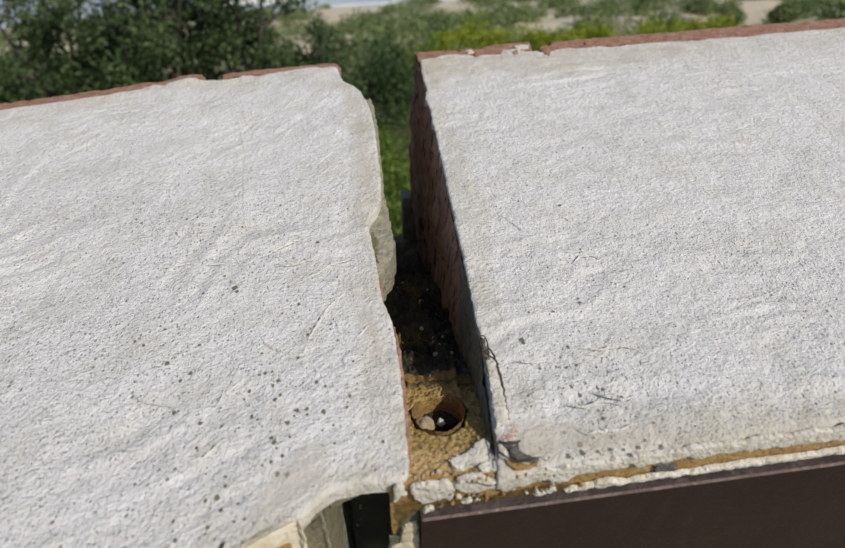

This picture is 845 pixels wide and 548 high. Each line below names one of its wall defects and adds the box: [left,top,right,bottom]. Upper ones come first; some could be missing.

spalling [278,494,361,548]
peeling [388,326,845,548]